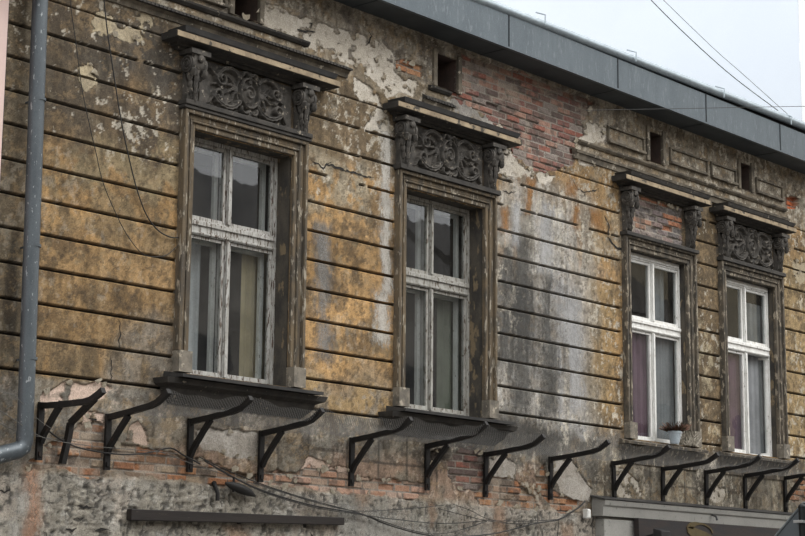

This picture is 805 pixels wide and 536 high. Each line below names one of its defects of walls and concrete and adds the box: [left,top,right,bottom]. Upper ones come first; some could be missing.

peeling [91,11,153,46]
peeling [78,62,99,92]
peeling [242,4,420,134]
flaking render [450,54,606,185]
flaking render [632,197,682,245]
leakage [501,207,583,416]
peeling [40,378,109,410]
flaking render [25,411,429,501]
flaking render [430,447,591,514]
leakage [503,423,560,463]